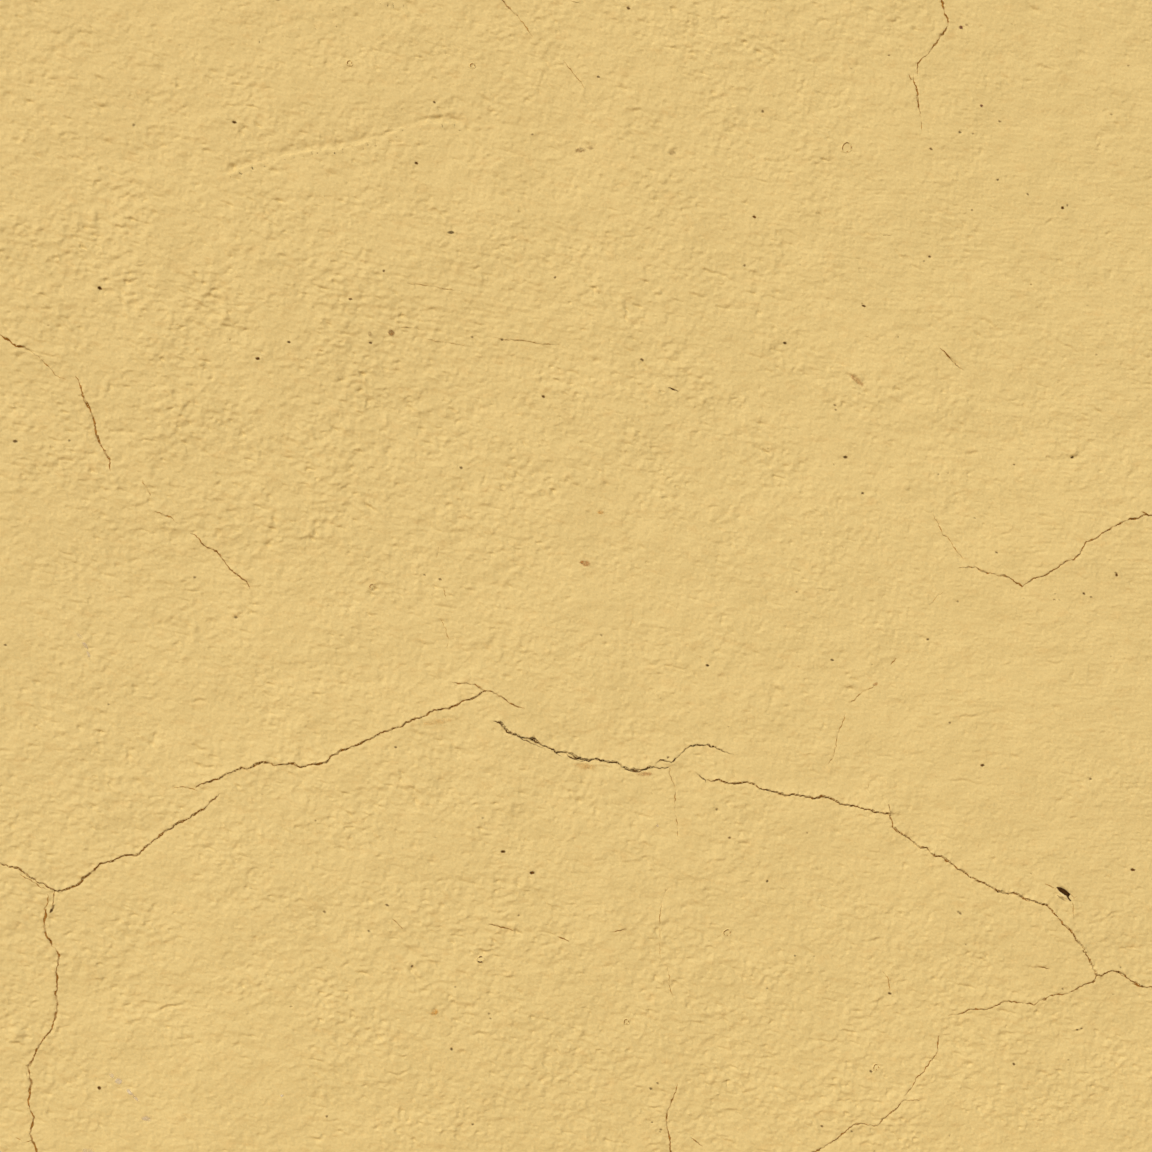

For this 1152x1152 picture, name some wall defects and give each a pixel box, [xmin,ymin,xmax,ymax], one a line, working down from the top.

crack [909,1,949,129]
crack [1,335,110,469]
crack [155,511,250,587]
crack [934,511,1151,587]
crack [1,682,1152,1152]